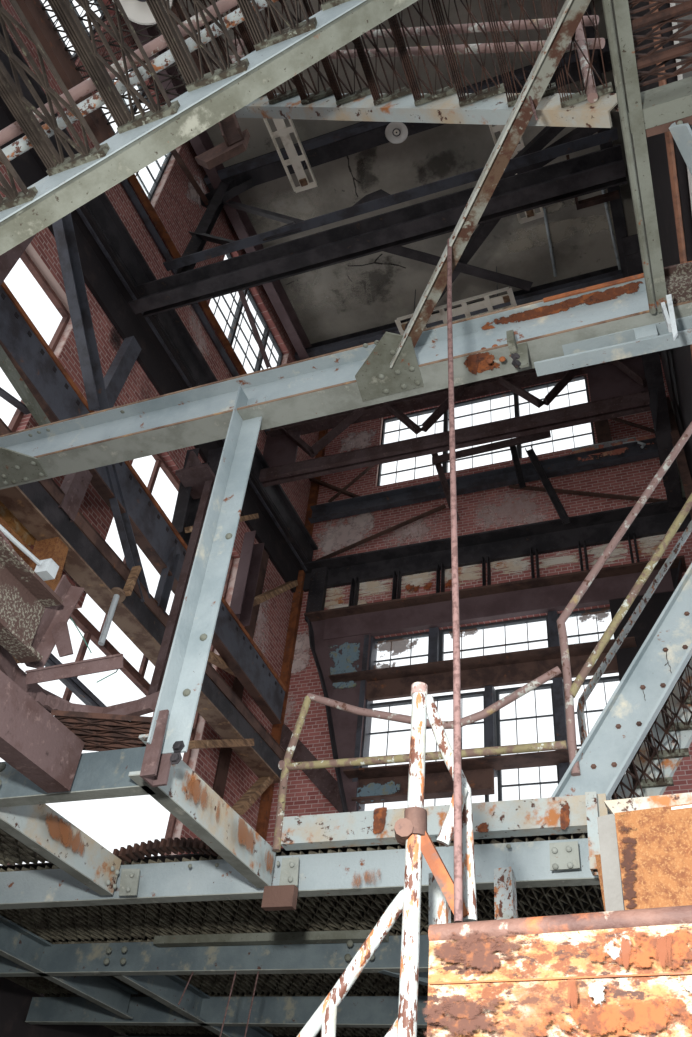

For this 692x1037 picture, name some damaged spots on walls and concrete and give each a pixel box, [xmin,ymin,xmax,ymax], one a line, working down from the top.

corrosion [481,281,643,330]
corrosion [464,352,500,375]
peeling [329,642,360,689]
corrosion [46,813,84,856]
corrosion [185,771,220,819]
corrosion [373,807,387,834]
corrosion [560,801,570,830]
corrosion [597,792,692,911]
corrosion [433,930,522,972]
corrosion [587,929,692,969]
corrosion [423,995,503,1037]
corrosion [513,977,692,1036]